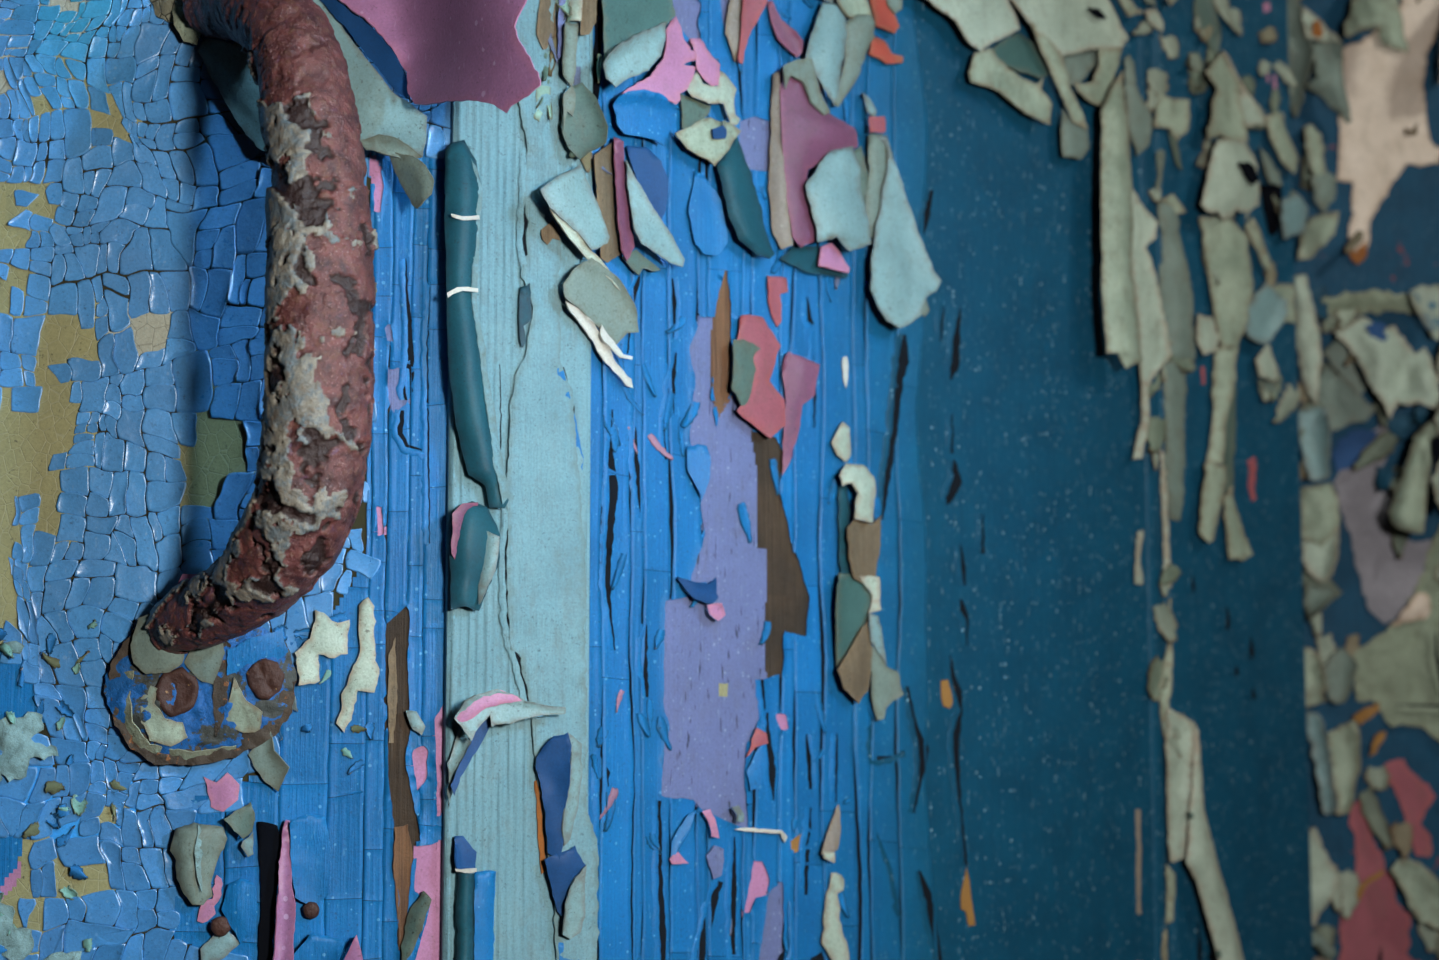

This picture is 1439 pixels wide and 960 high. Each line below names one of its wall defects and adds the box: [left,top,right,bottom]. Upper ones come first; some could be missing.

peeling [674,93,772,199]
peeling [1272,0,1439,265]
peeling [0,159,173,731]
peeling [173,346,259,521]
crack [0,0,452,960]
crack [492,364,502,449]
peeling [603,246,810,828]
crack [557,0,985,960]
peeling [1333,391,1439,627]
rust [109,627,297,766]
peeling [0,754,136,960]
peeling [1316,702,1439,960]